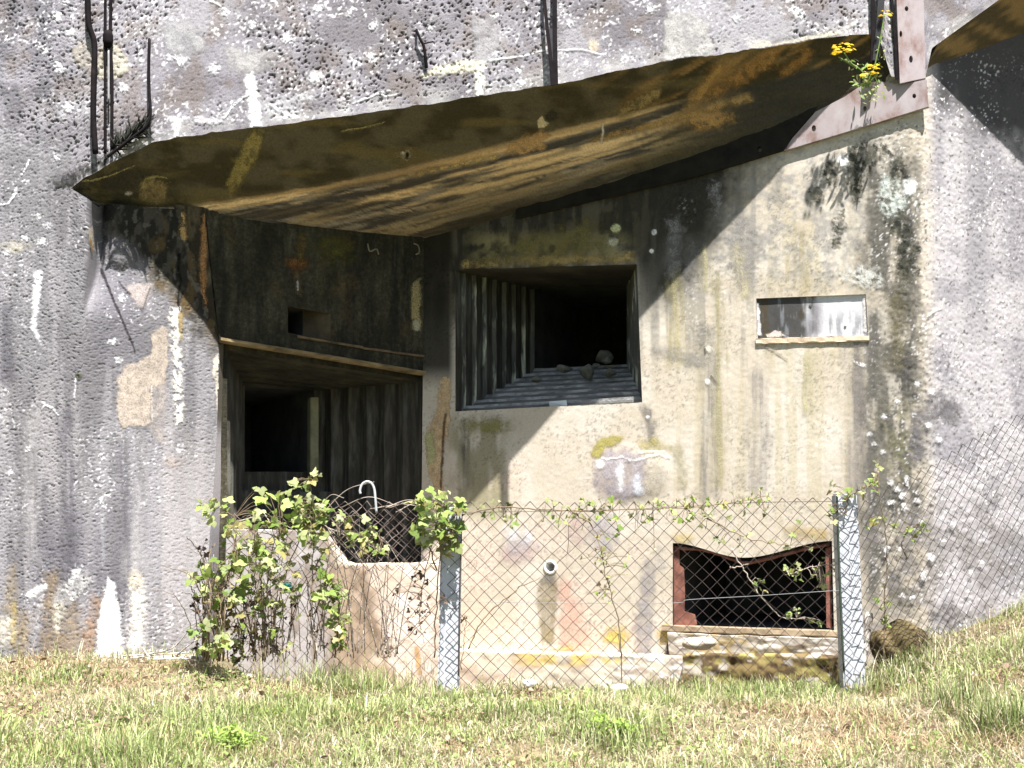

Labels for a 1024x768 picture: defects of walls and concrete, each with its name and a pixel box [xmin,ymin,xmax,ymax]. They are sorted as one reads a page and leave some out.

peeling [117,326,169,442]
damp [853,341,888,522]
damp [26,475,93,630]